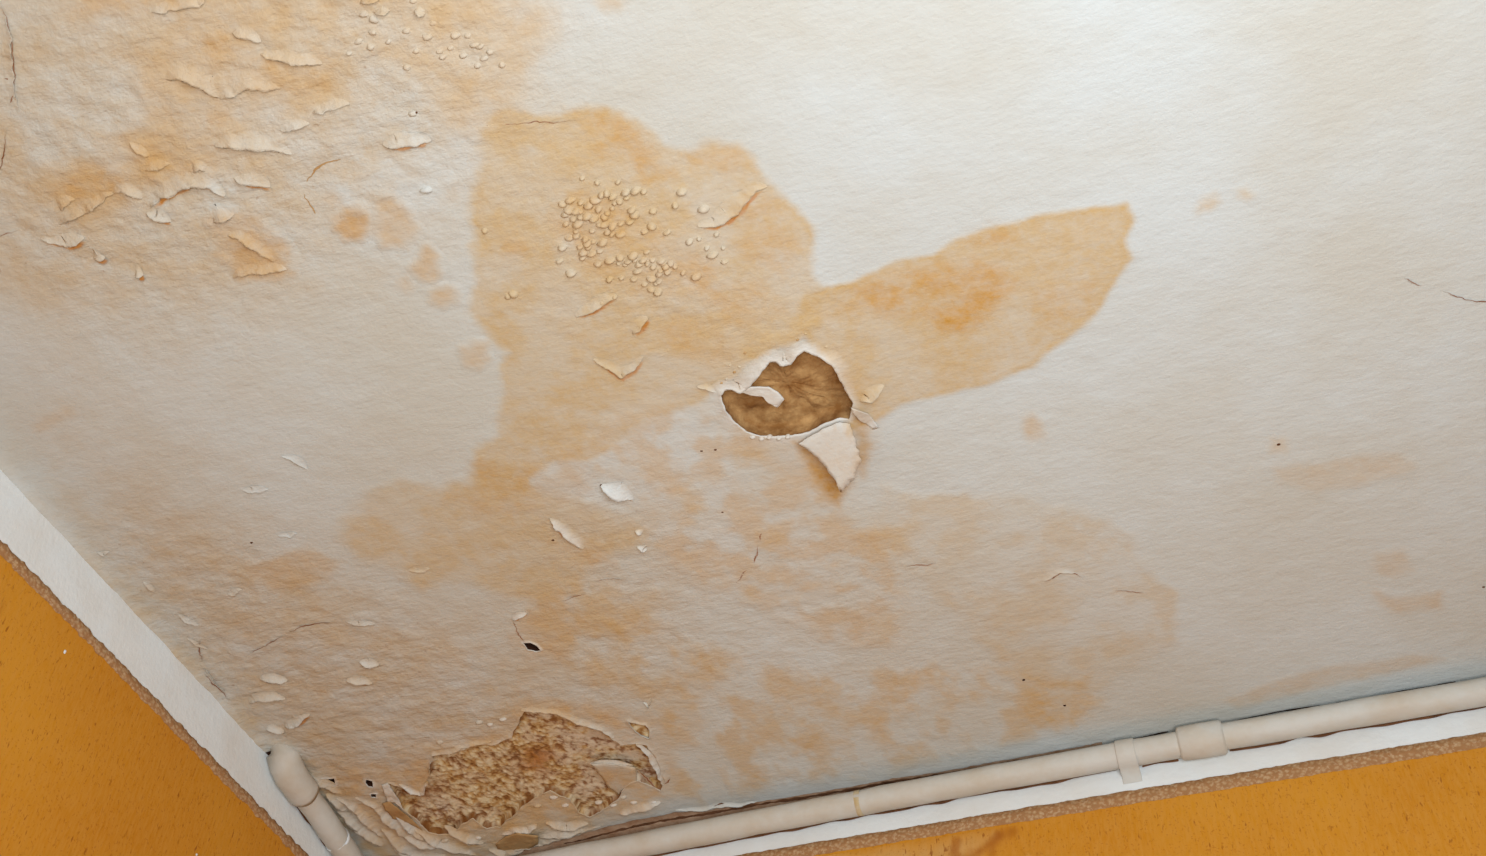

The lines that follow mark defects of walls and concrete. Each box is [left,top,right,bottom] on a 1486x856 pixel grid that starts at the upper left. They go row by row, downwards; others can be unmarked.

crack [0,4,18,169]
peeling [41,142,287,278]
peeling [165,24,322,99]
peeling [215,98,350,155]
peeling [383,132,433,153]
leakage [2,0,1188,810]
flaking render [309,698,669,856]